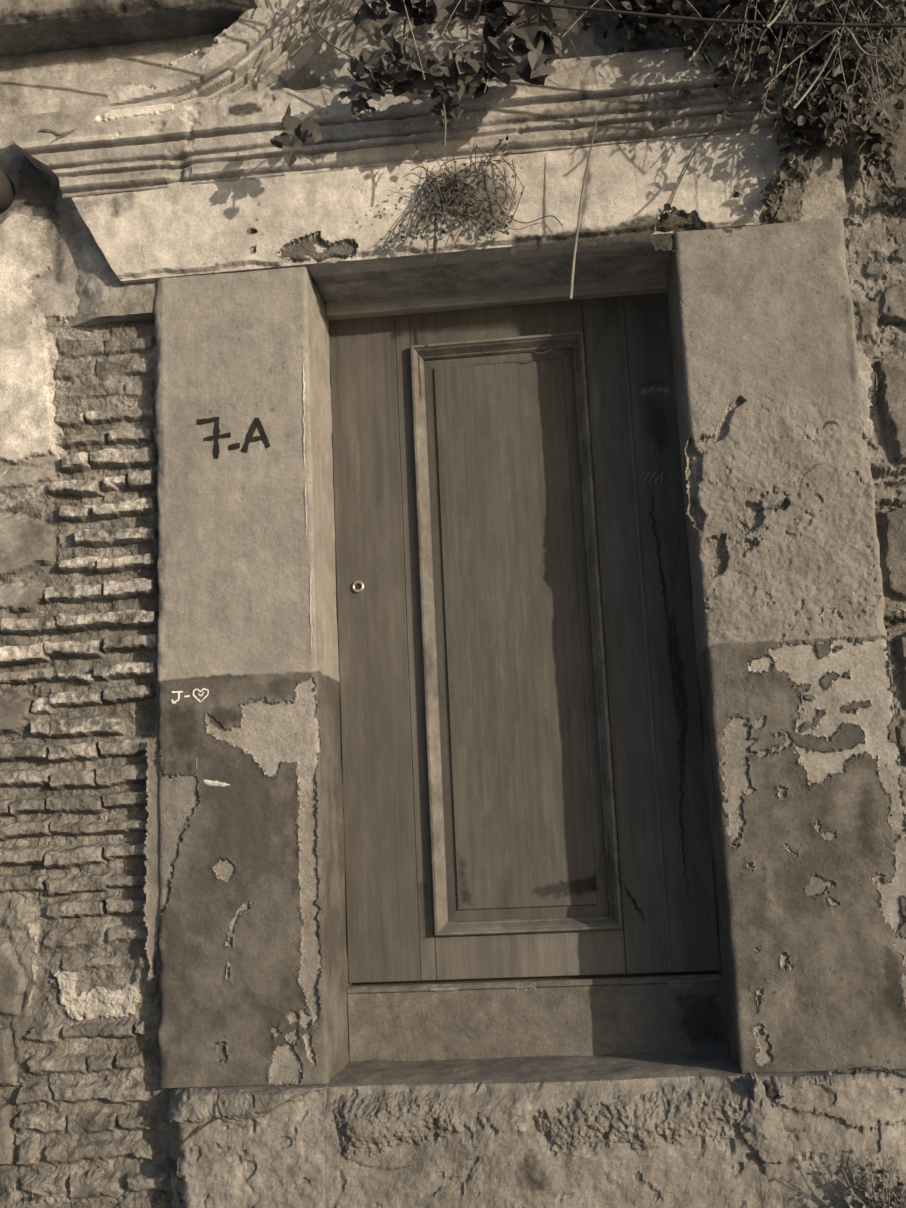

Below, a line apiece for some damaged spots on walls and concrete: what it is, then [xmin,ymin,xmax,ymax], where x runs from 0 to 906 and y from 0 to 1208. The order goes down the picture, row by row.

flaking render [160,50,198,70]
flaking render [276,231,358,264]
flaking render [649,210,711,252]
flaking render [685,396,790,578]
flaking render [0,317,322,1208]
peeling [719,636,906,1004]
crack [828,1065,906,1085]
crack [534,1115,542,1133]
crack [765,1080,807,1132]